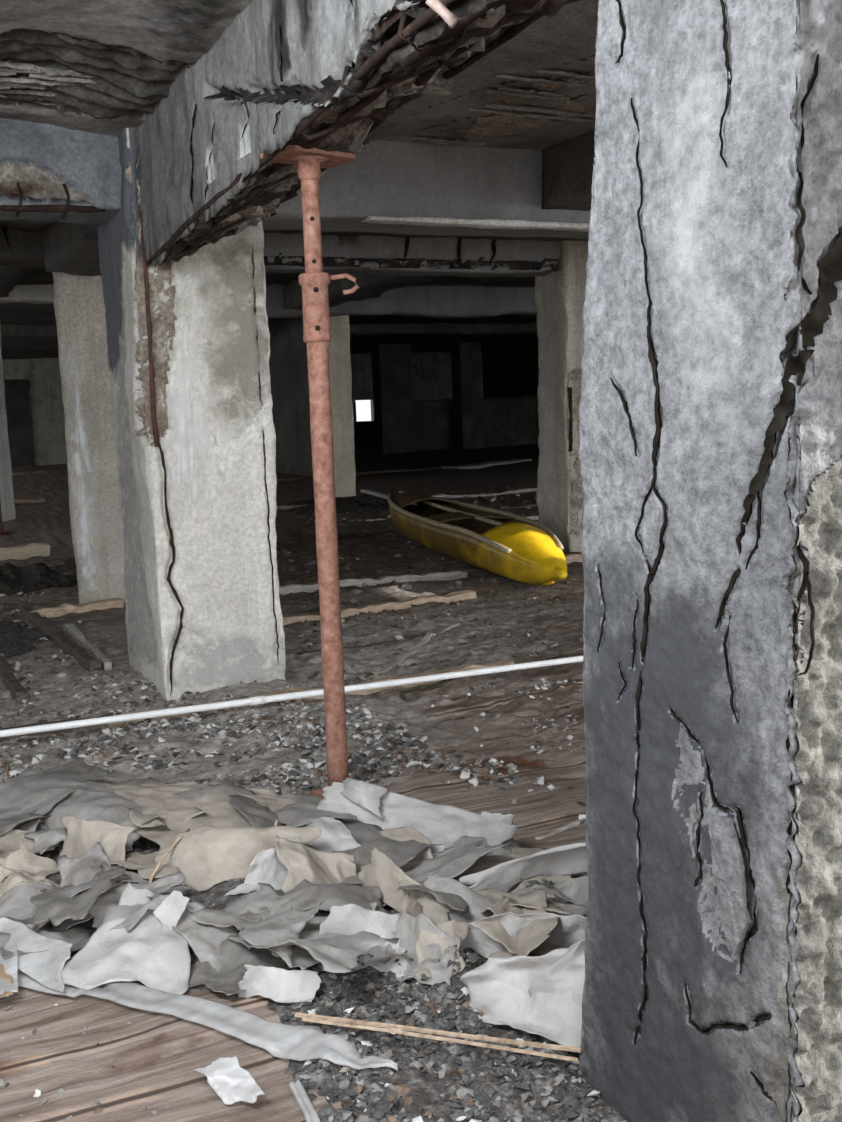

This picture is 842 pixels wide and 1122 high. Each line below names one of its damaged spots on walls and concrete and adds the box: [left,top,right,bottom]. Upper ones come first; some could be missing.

spalling [0,160,105,219]
spalling [0,29,188,122]
leakage [269,0,290,81]
leakage [299,0,358,33]
spalling [125,0,596,447]
crack [719,0,732,167]
crack [159,443,184,696]
crack [597,98,668,1044]
crack [715,54,842,894]
crack [670,709,757,974]
spalling [672,722,758,963]
spalling [787,458,842,1122]